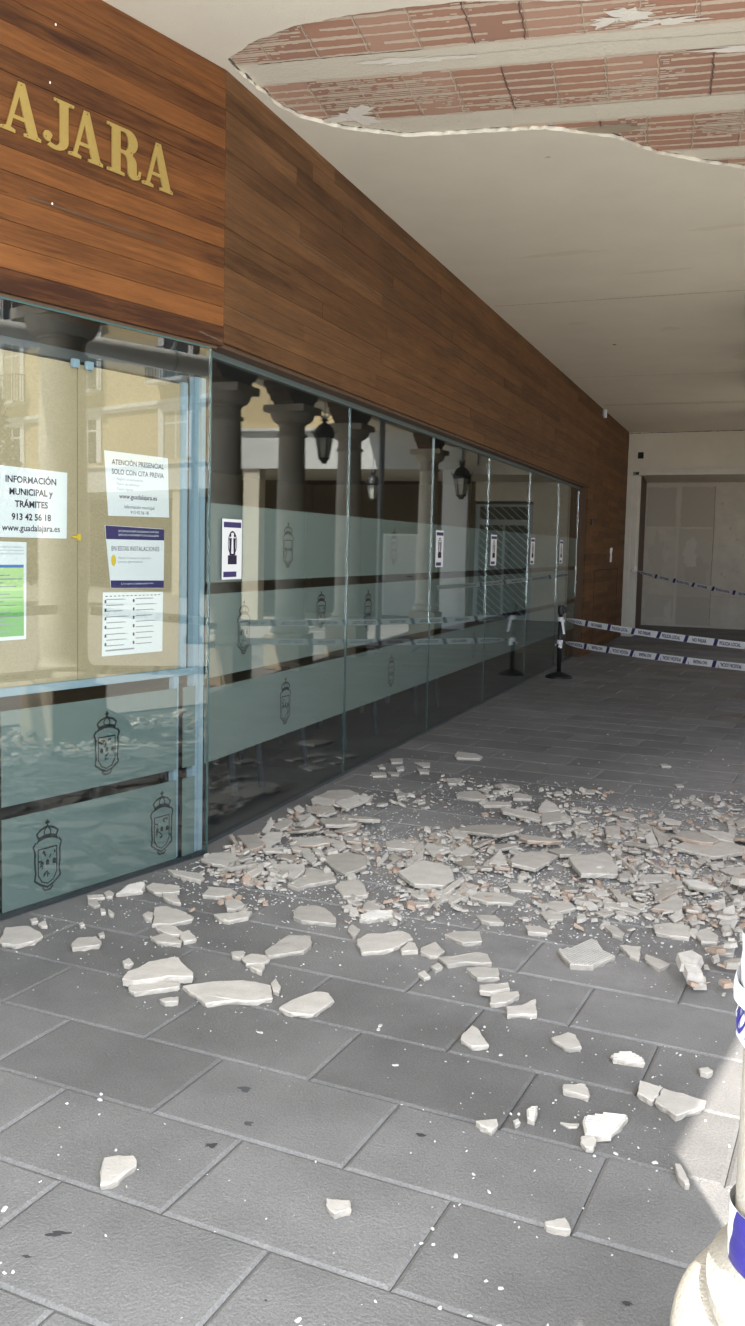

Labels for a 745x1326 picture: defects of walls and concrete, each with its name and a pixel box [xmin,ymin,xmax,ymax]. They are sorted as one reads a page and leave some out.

spalling [227,0,745,169]